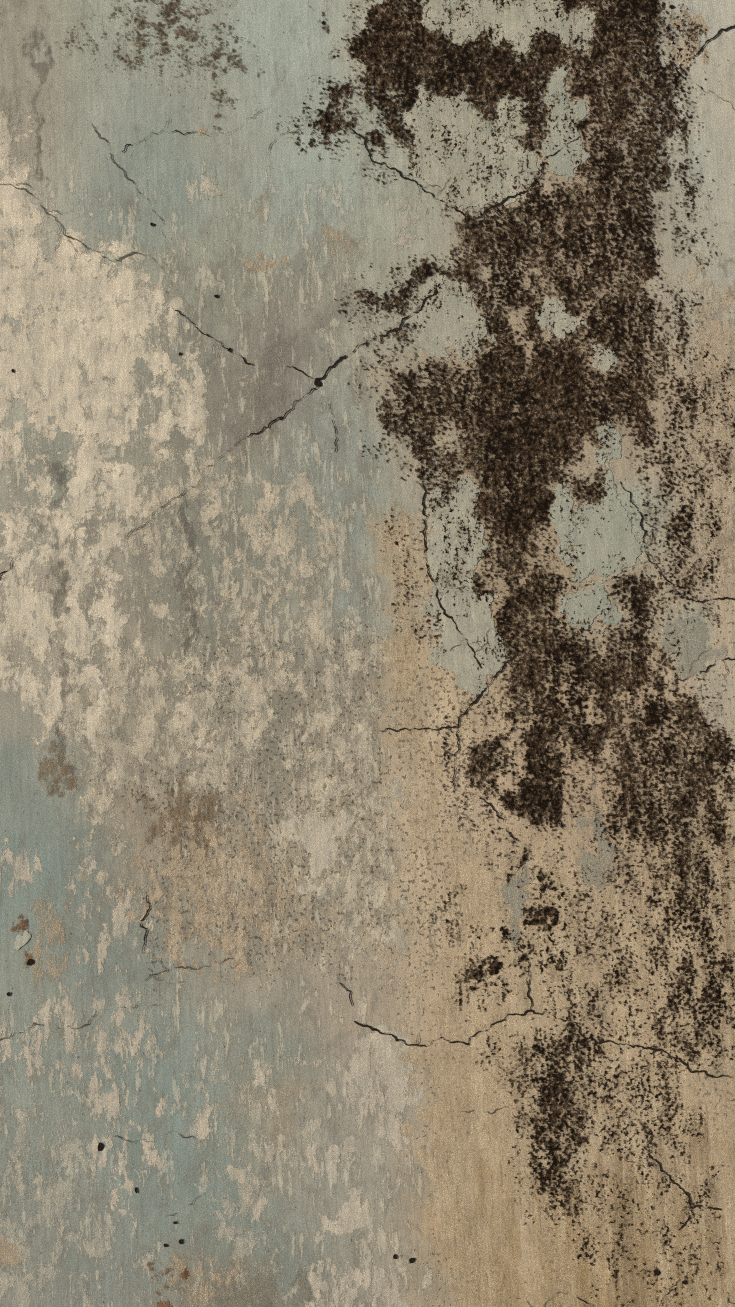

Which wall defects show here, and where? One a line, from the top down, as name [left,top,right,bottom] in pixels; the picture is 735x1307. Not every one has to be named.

crack [0,111,300,365]
crack [113,285,437,551]
damp [276,0,735,1307]
crack [620,481,735,687]
crack [337,958,735,1101]